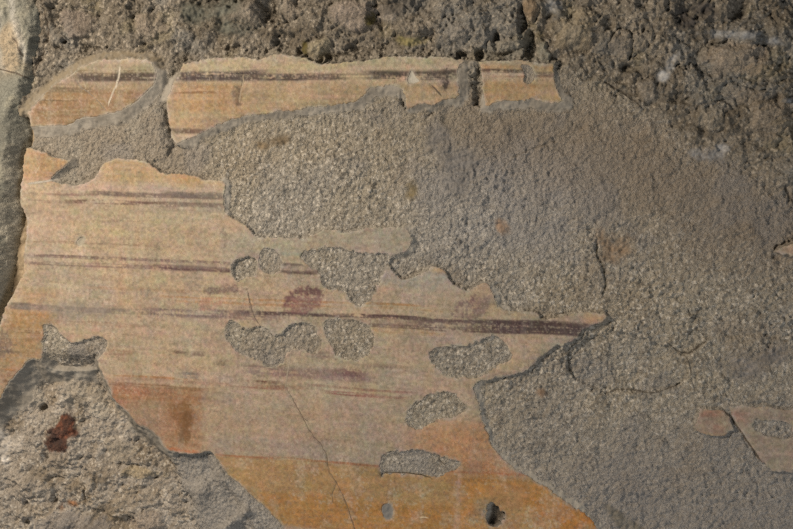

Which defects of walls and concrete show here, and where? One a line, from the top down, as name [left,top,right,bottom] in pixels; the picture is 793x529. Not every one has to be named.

flaking render [29,62,194,186]
flaking render [177,60,793,529]
spalling [0,324,283,529]
crack [288,392,355,529]